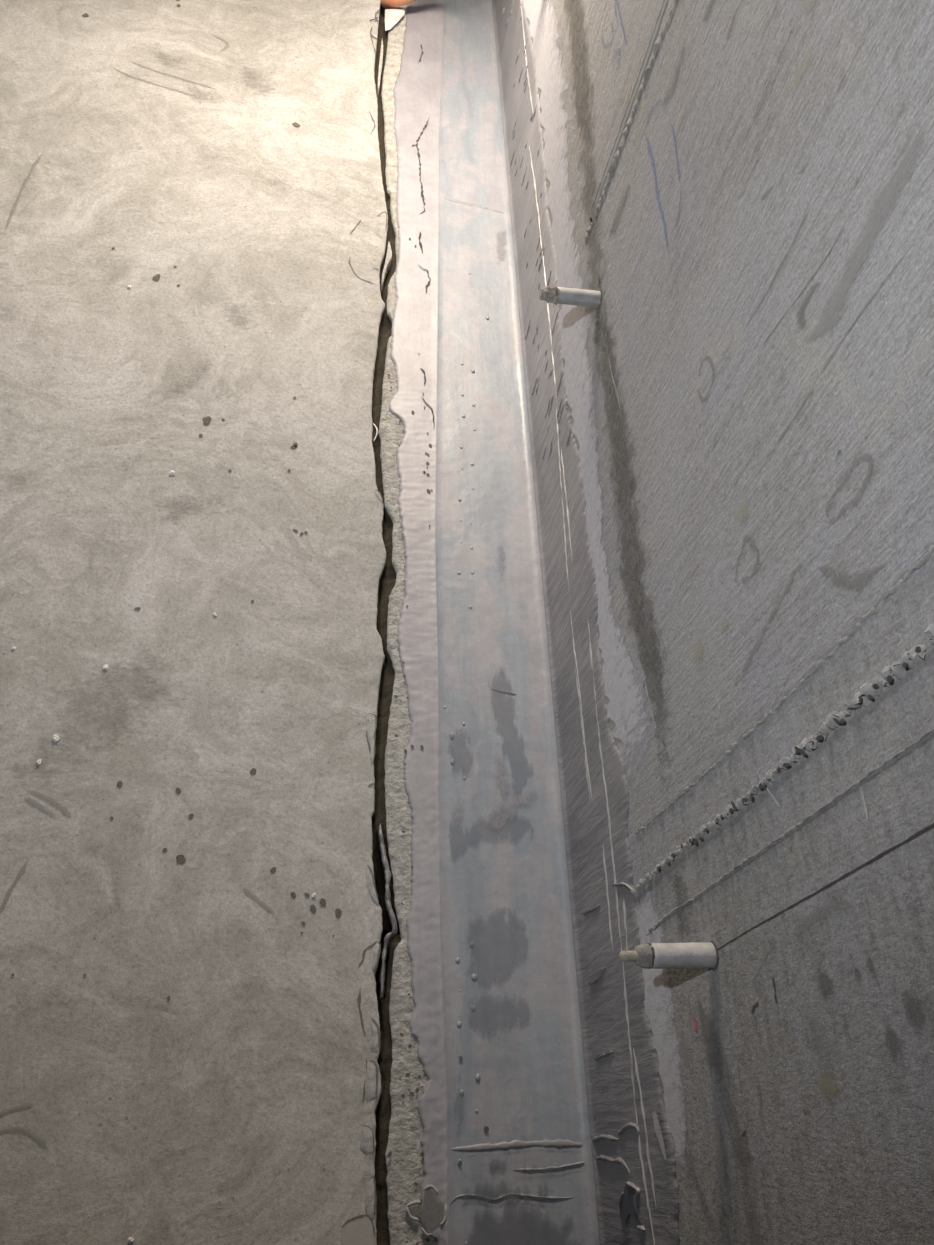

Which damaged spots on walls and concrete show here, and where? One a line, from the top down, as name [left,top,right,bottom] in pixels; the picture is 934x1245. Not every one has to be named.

crack [372,5,431,1245]
crack [420,368,435,424]
leakage [523,0,667,785]